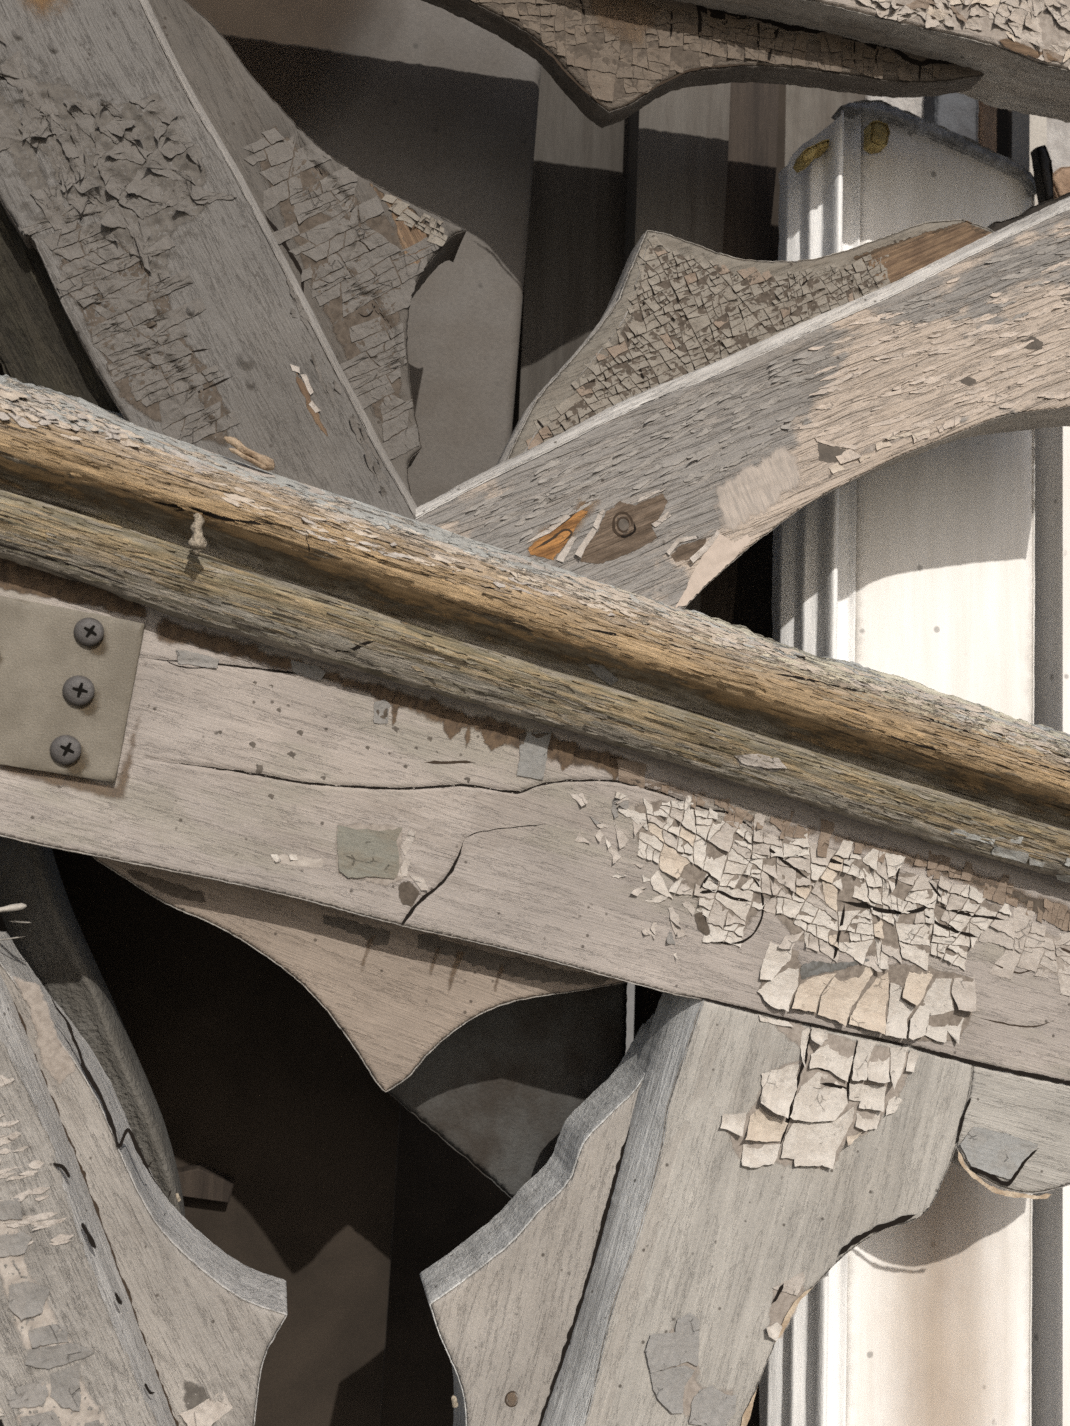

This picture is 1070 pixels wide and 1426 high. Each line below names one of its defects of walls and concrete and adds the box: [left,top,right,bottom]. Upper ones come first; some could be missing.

peeling [471,0,941,102]
crack [151,759,1070,974]
peeling [568,758,710,959]
peeling [950,829,1070,883]
peeling [720,907,1070,1169]
peeling [960,1127,1038,1179]
peeling [0,1114,109,1426]
peeling [179,1382,233,1426]
crack [538,1127,630,1426]
peeling [645,1313,737,1426]